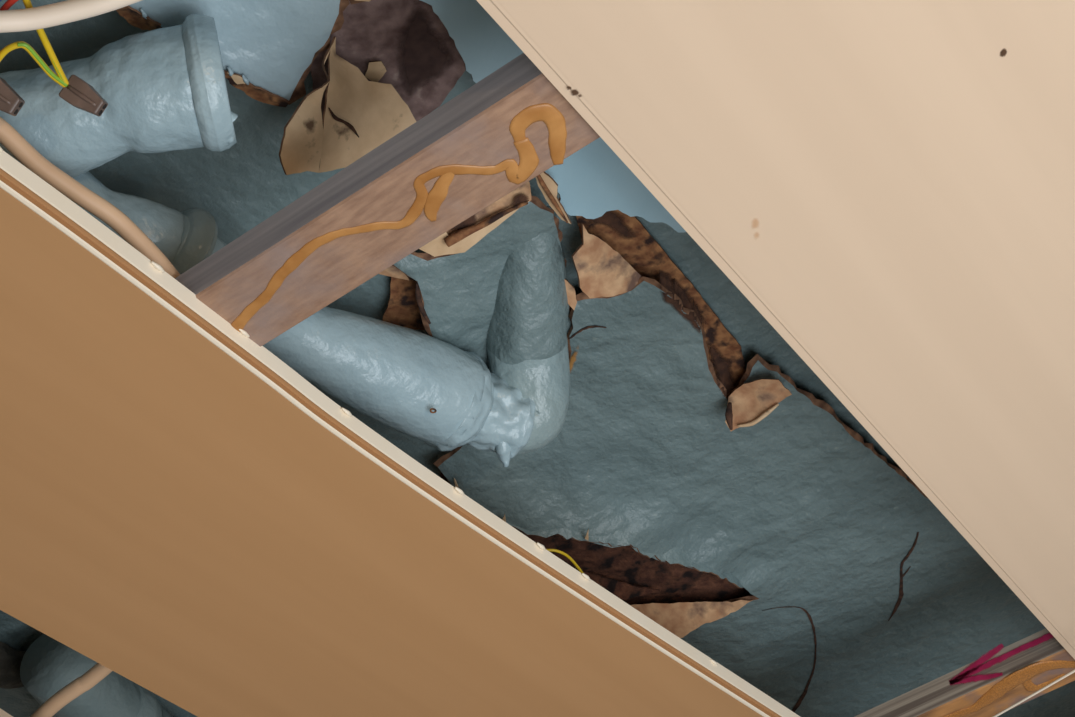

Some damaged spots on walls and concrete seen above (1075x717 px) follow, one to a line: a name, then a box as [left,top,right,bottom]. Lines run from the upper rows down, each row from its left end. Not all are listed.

peeling [379,137,1046,717]
crack [888,532,919,621]
crack [762,607,817,712]
peeling [998,681,1075,717]